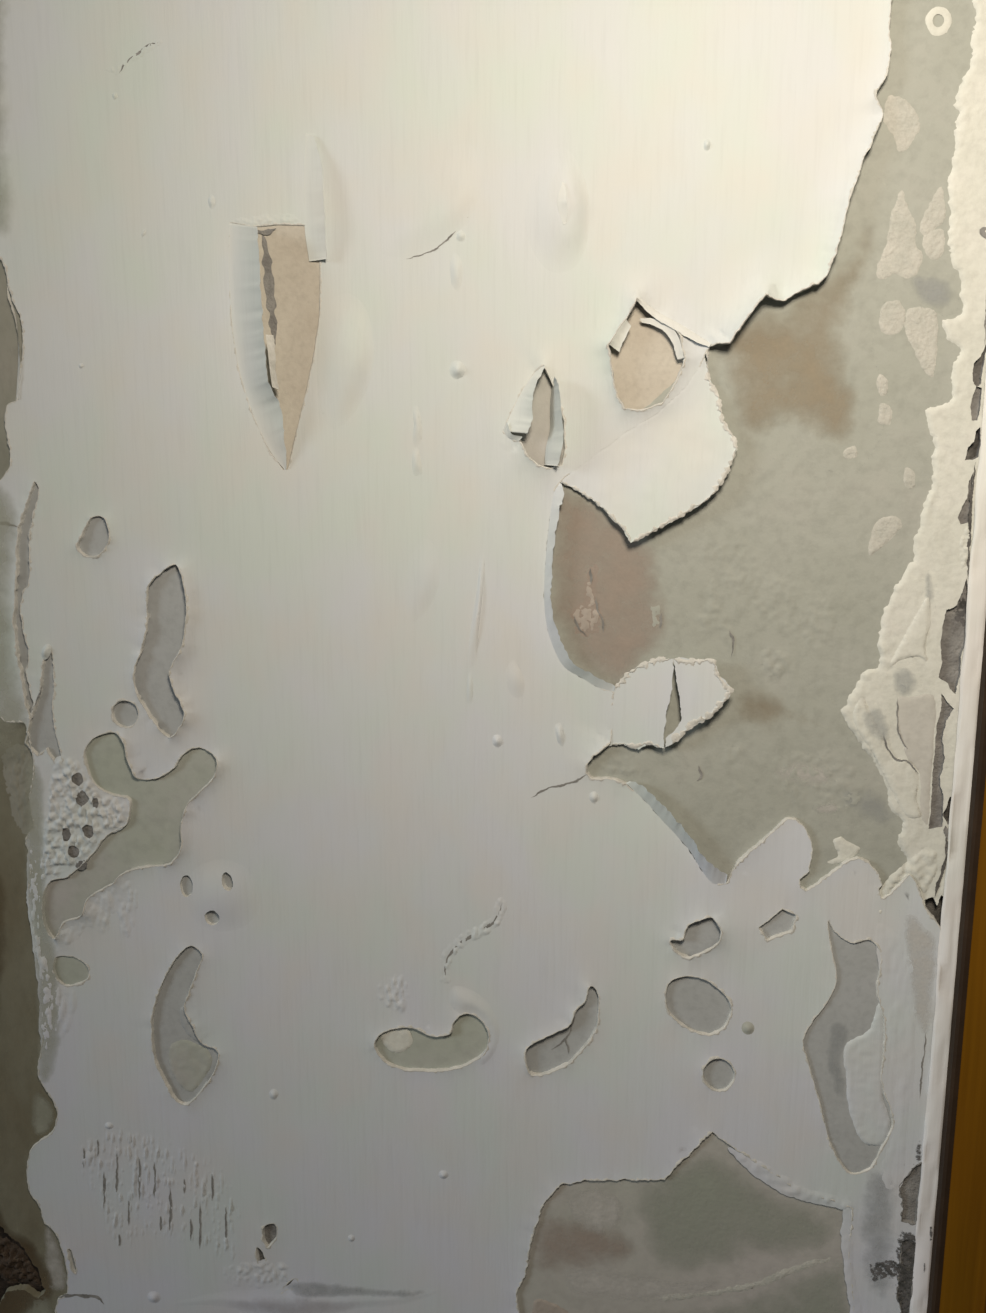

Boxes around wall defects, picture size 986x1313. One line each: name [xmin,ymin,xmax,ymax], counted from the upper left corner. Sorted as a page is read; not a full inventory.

peeling [0,256,25,480]
peeling [75,515,111,559]
peeling [543,0,986,930]
peeling [0,563,220,1313]
peeling [374,986,500,1073]
peeling [523,986,600,1077]
peeling [663,915,733,1036]
peeling [701,1056,736,1092]
peeling [802,921,895,1175]
peeling [515,1131,862,1313]